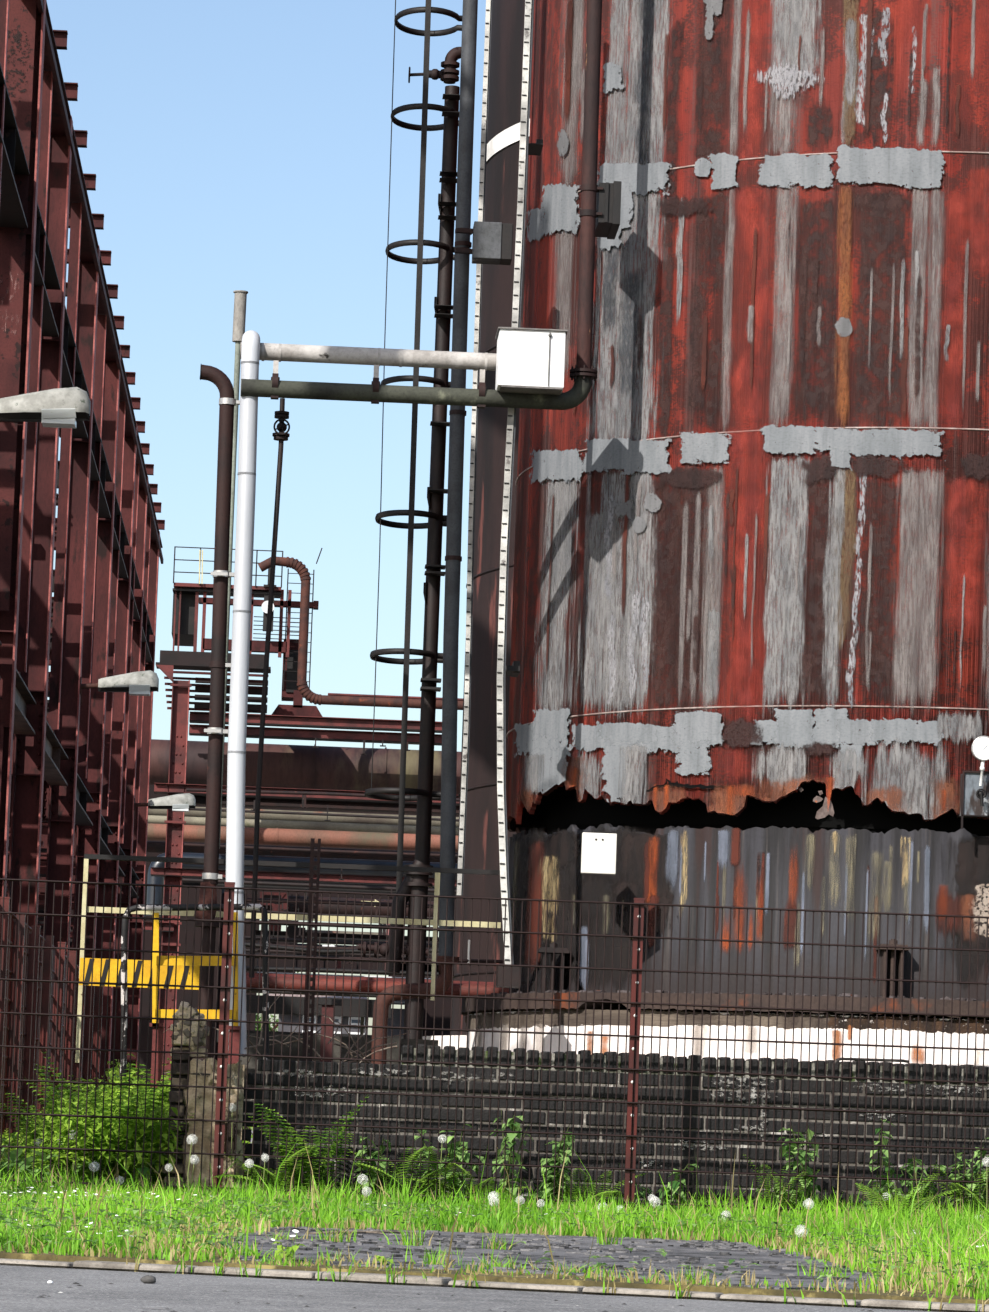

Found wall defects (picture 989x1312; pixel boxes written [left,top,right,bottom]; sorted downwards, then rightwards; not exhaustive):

corrosion [843,0,859,145]
peeling [757,144,946,189]
peeling [597,161,672,251]
corrosion [837,187,851,427]
peeling [528,431,731,485]
peeling [760,424,945,471]
peeling [514,708,724,802]
peeling [748,707,982,772]
corrosion [653,785,685,812]
corrosion [765,778,832,809]
corrosion [869,788,902,811]
corrosion [710,785,762,950]